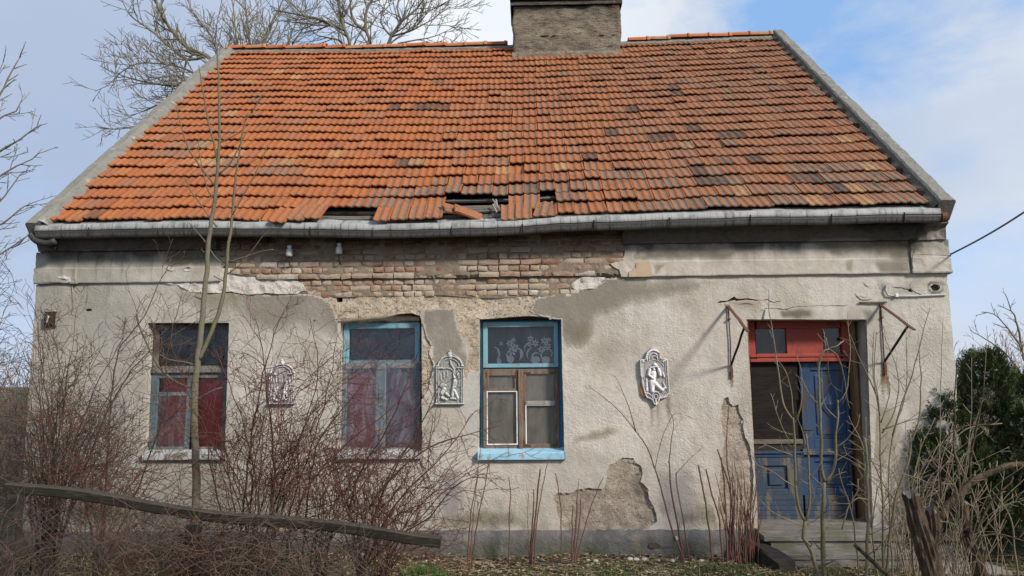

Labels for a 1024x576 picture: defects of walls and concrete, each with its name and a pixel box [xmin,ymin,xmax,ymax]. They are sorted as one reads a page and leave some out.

flaking render [216,230,625,399]
crack [717,285,872,311]
flaking render [553,458,657,530]
flaking render [717,397,753,529]